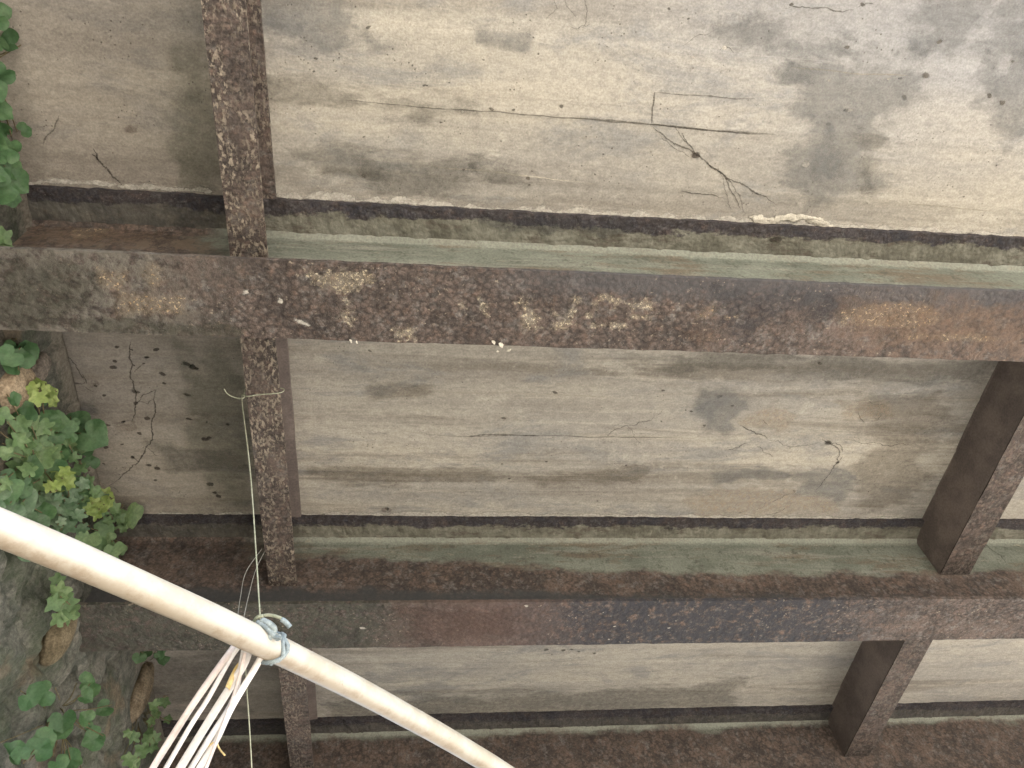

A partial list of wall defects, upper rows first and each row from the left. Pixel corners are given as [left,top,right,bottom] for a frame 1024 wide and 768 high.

crack [92,148,121,184]
crack [651,92,774,208]
leakage [276,191,1014,236]
crack [115,342,156,482]
crack [766,440,843,515]